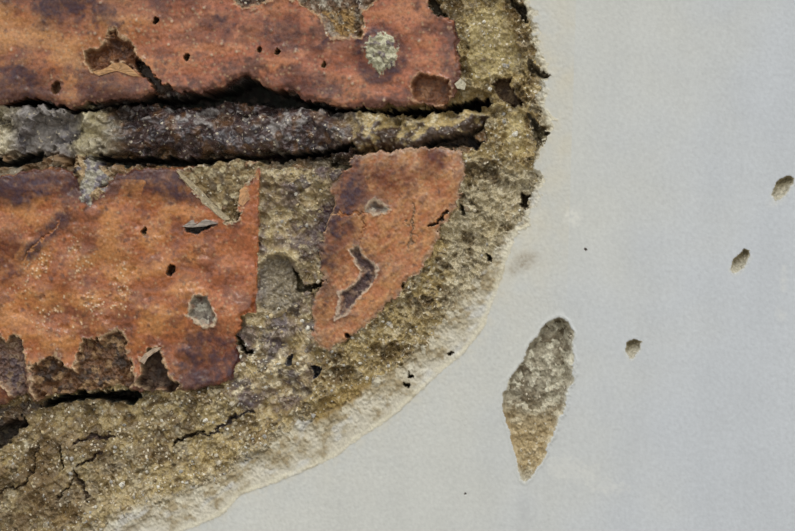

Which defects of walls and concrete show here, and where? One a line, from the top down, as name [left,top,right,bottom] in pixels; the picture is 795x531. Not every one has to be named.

crack [5,60,492,151]
crack [0,151,47,169]
crack [98,143,357,169]
spalling [770,174,795,203]
spalling [0,0,559,531]
spalling [729,248,752,276]
spalling [623,337,644,362]
spalling [500,315,578,485]
crack [0,389,143,503]
crack [172,409,255,448]